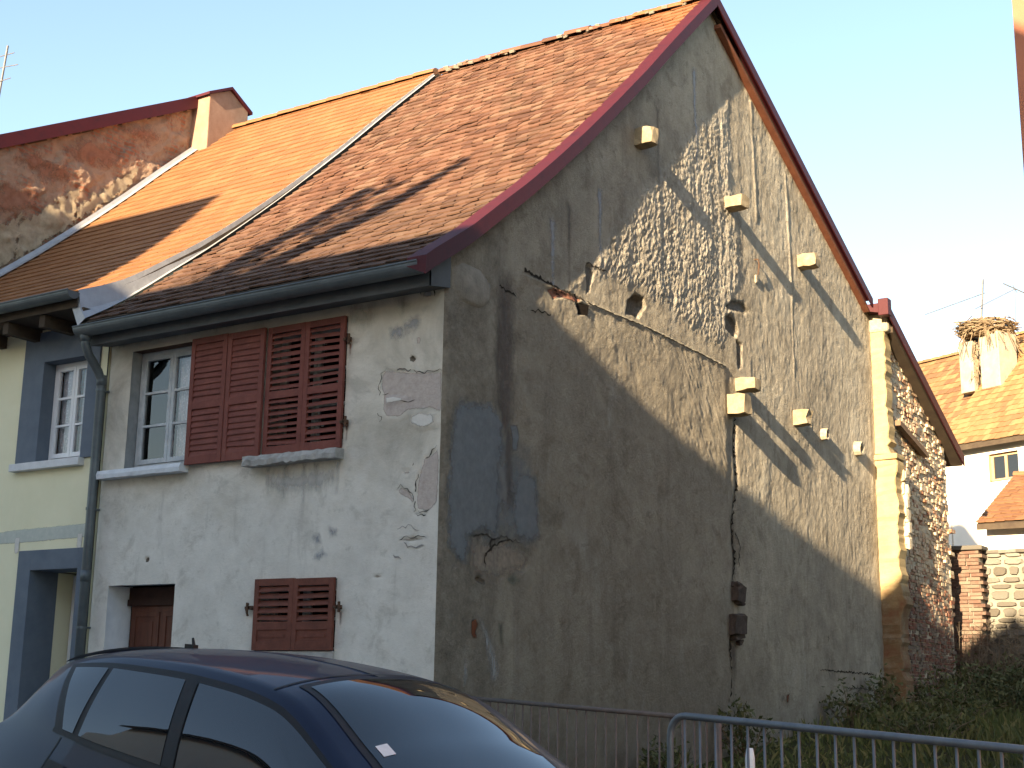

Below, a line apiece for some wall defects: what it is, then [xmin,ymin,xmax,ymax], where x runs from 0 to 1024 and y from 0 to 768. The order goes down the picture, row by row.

crack [499,268,585,316]
flaking render [625,295,644,317]
peeling [377,368,441,426]
peeling [398,445,438,516]
crack [731,417,741,580]